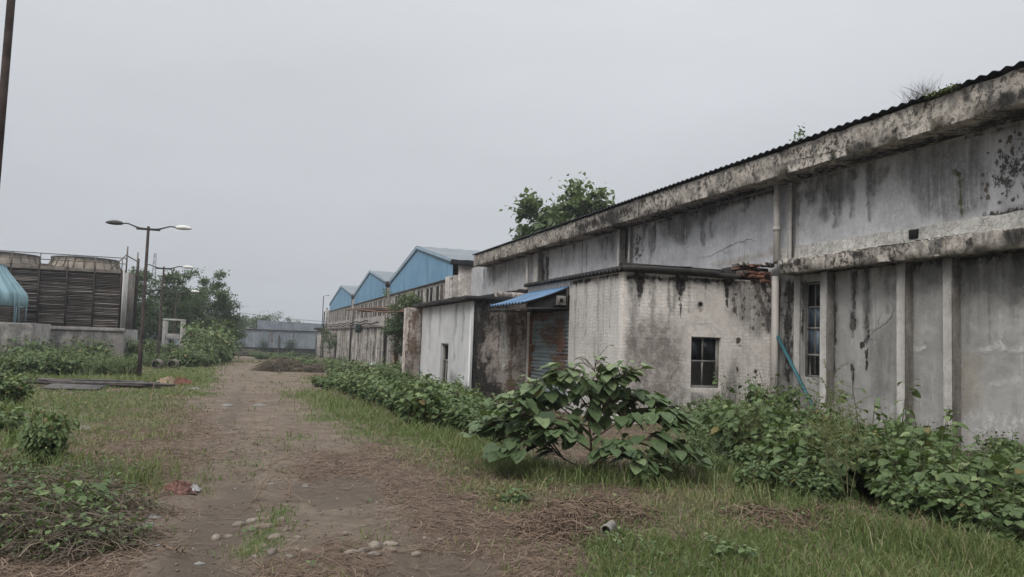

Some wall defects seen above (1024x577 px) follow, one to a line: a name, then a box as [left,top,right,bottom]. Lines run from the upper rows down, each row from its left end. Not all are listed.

leakage [473,301,526,400]
leakage [482,81,1024,391]